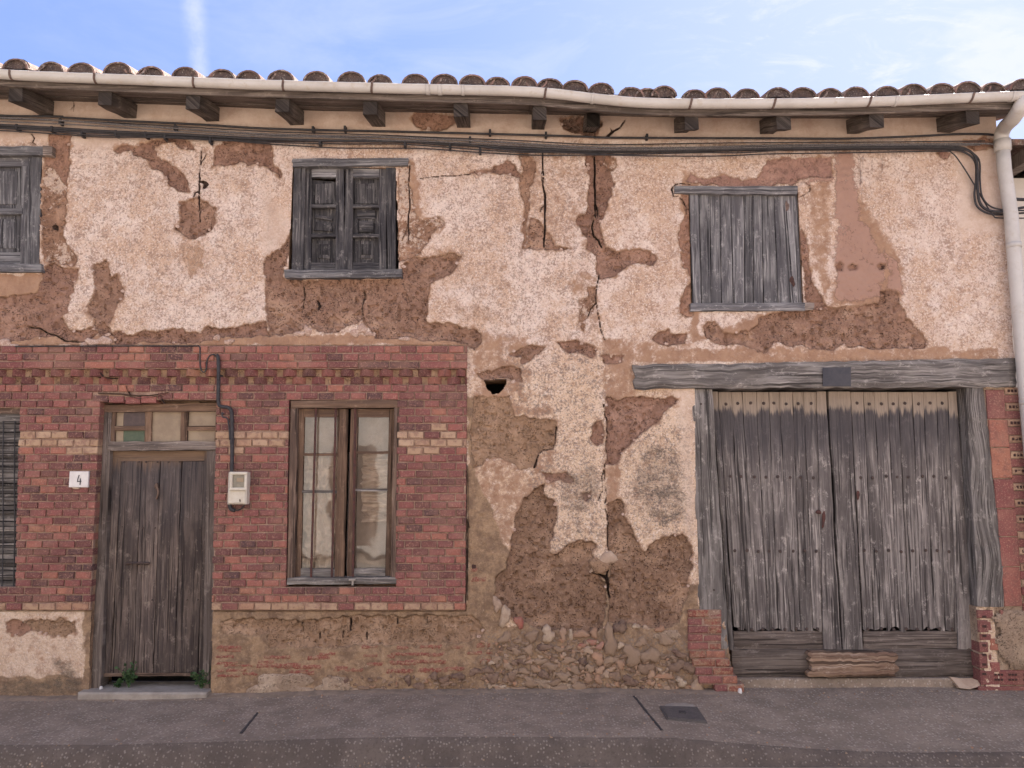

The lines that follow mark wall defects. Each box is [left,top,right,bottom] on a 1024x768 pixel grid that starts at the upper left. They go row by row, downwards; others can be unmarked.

crack [193,147,209,222]
flaking render [0,134,482,350]
crack [539,153,547,247]
crack [591,157,602,248]
flaking render [558,153,657,364]
flaking render [678,151,927,354]
flaking render [470,345,693,633]
crack [591,404,610,598]
flaking render [6,617,76,637]